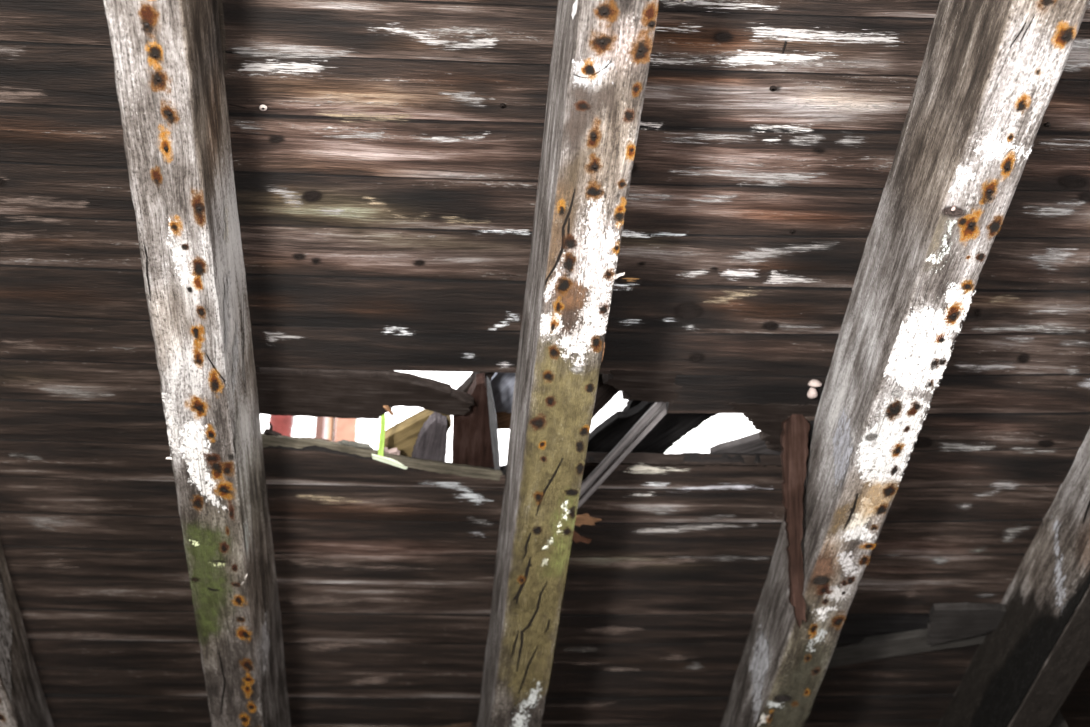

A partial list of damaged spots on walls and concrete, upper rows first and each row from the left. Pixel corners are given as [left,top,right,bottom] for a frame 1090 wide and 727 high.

rust [581,0,618,78]
rust [138,4,179,185]
rust [958,133,1015,241]
rust [170,217,206,293]
rust [191,306,223,392]
crack [545,189,575,285]
rust [550,234,576,331]
damp [555,280,588,336]
rust [935,281,973,343]
rust [185,396,235,553]
rust [871,400,920,530]
crack [511,458,563,694]